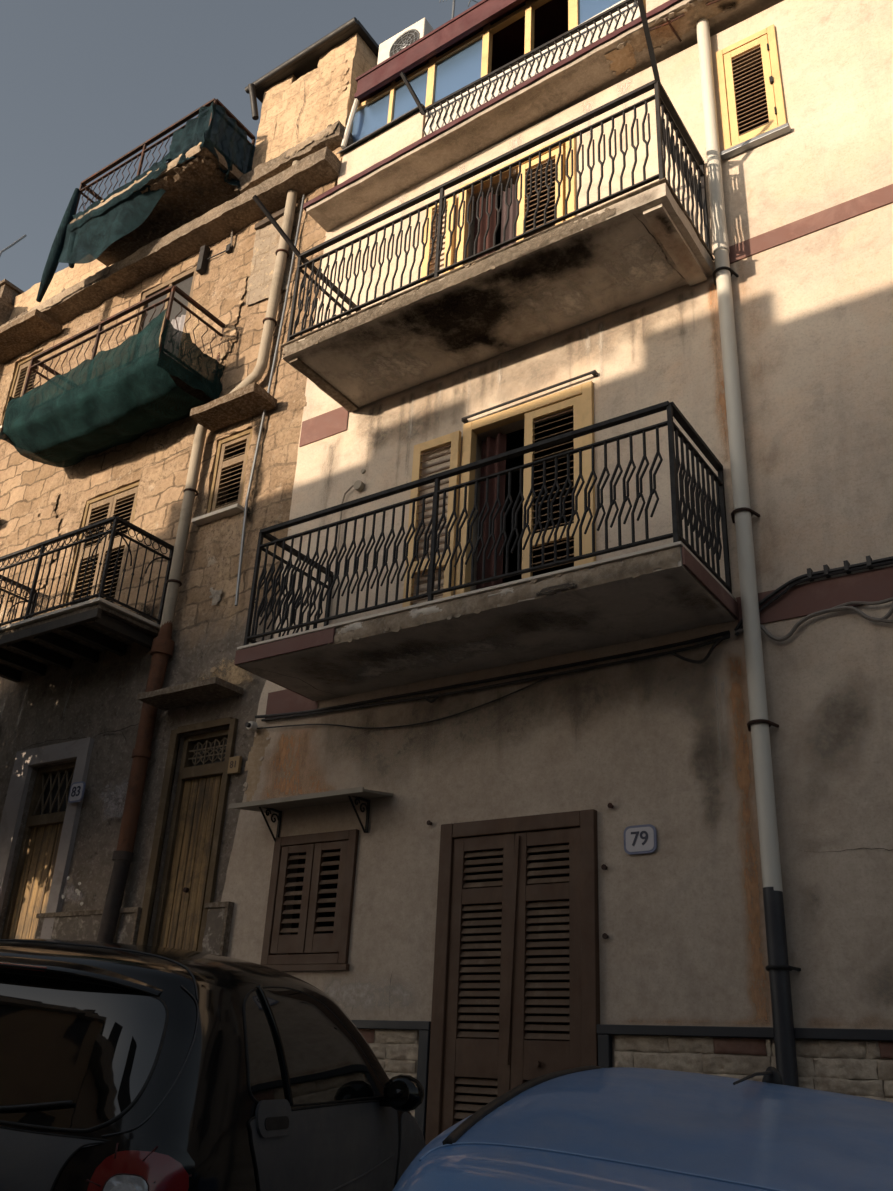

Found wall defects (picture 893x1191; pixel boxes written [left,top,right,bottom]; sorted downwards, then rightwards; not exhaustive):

water stain [349,219,652,388]
water stain [365,389,445,444]
spalling [328,546,681,645]